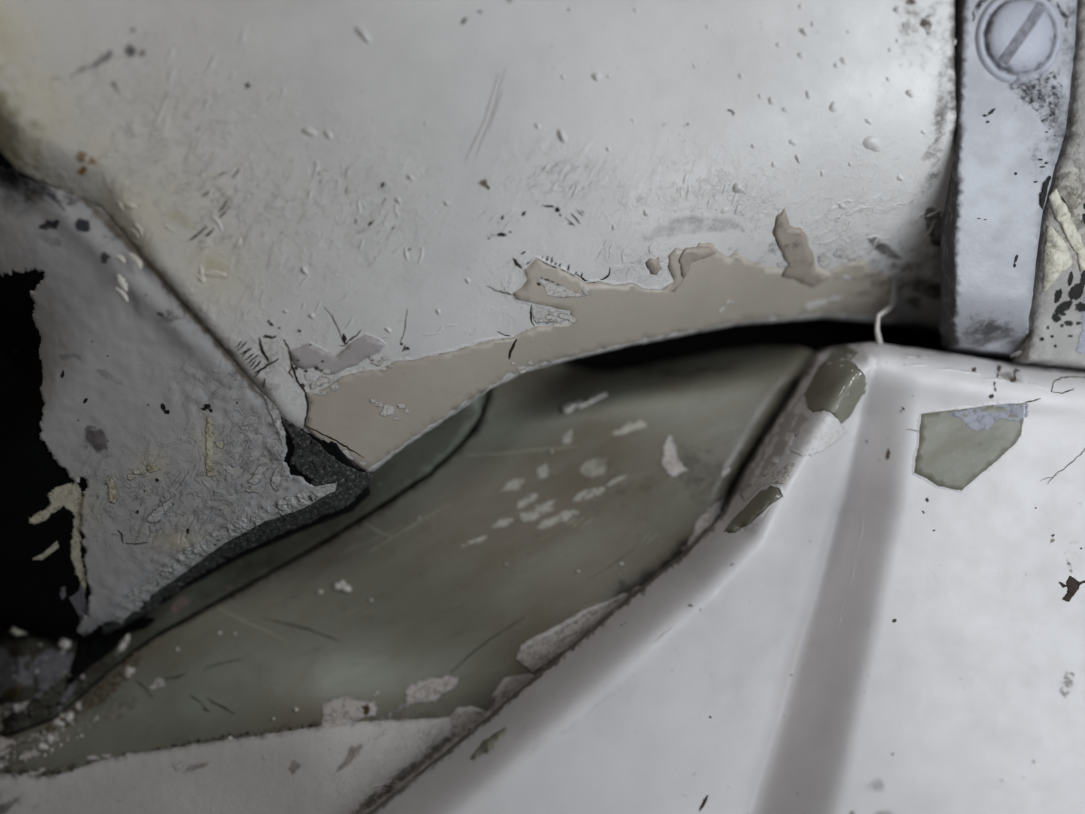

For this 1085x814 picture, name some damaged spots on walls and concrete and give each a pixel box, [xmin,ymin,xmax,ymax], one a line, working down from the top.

peeling [285,208,896,471]
peeling [661,435,687,478]
spalling [722,344,869,534]
spalling [911,400,1026,493]
peeling [33,541,59,560]
peeling [17,681,82,760]
peeling [380,673,458,720]